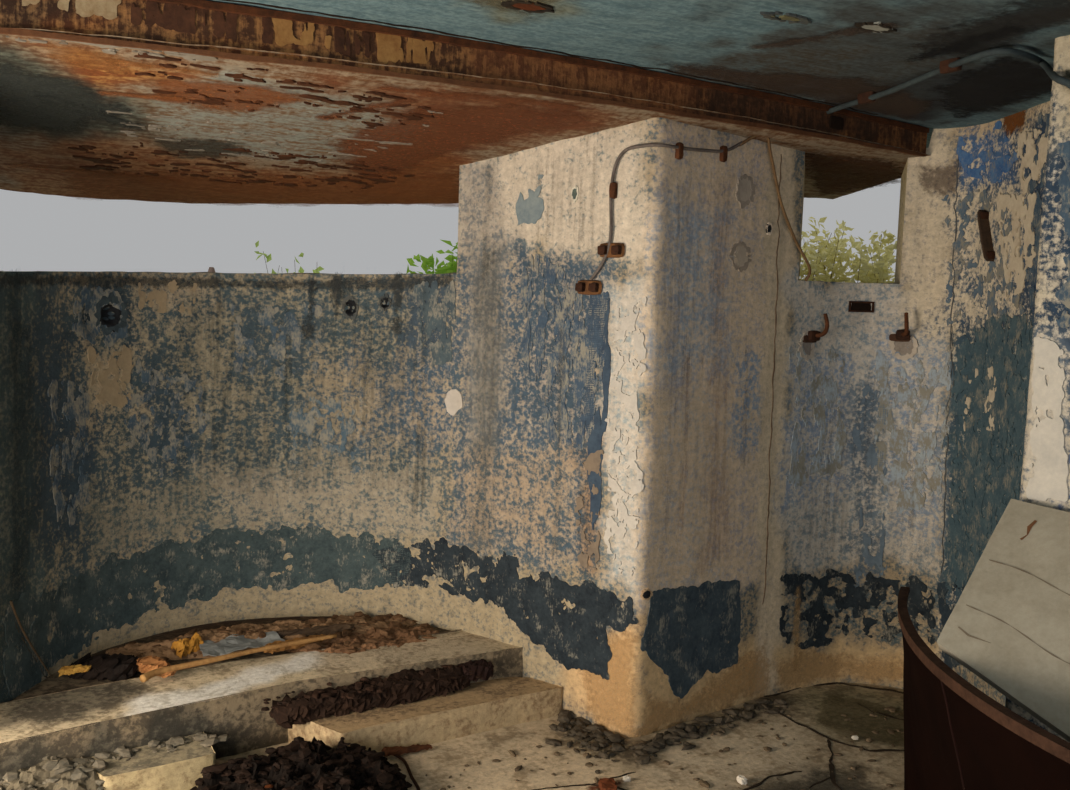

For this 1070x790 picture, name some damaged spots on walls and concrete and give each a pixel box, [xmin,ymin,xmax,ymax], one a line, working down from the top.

corrosion [131,0,250,42]
corrosion [262,9,274,44]
water stain [0,63,413,162]
corrosion [663,64,931,120]
water stain [934,57,1052,118]
peeling [779,112,1070,671]
peeling [1,253,741,699]
crack [743,682,904,790]